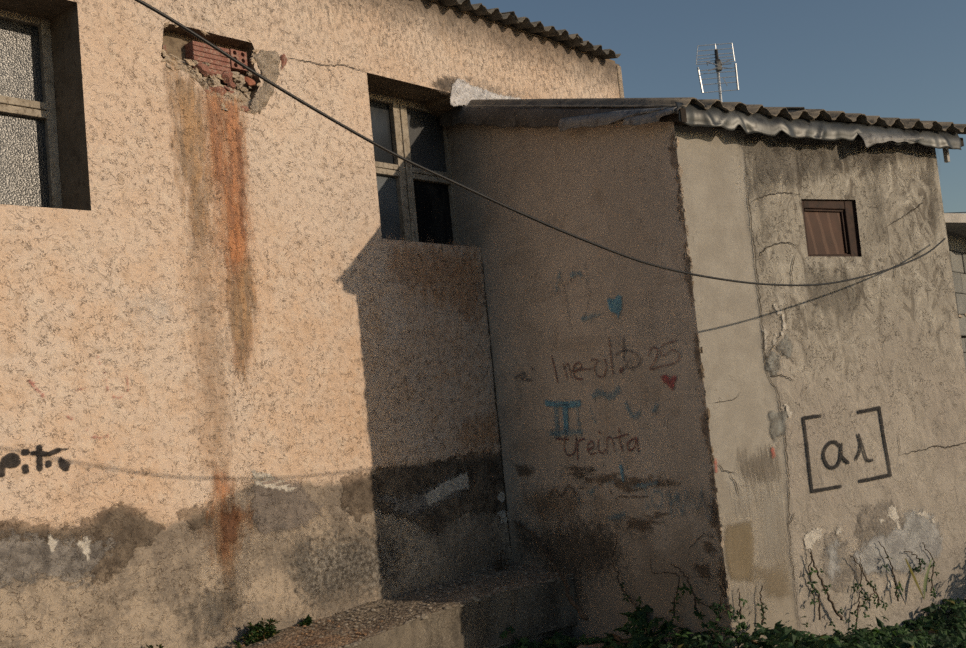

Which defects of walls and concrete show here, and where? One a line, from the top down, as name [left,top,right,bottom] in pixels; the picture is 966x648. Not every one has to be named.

flaking render [161,21,287,119]
rust [167,75,256,377]
damp [189,583,241,639]
rust [211,474,252,575]
damp [287,530,401,608]
damp [497,491,617,609]
damp [569,466,676,493]
flaking render [804,501,943,592]
crack [899,441,966,455]